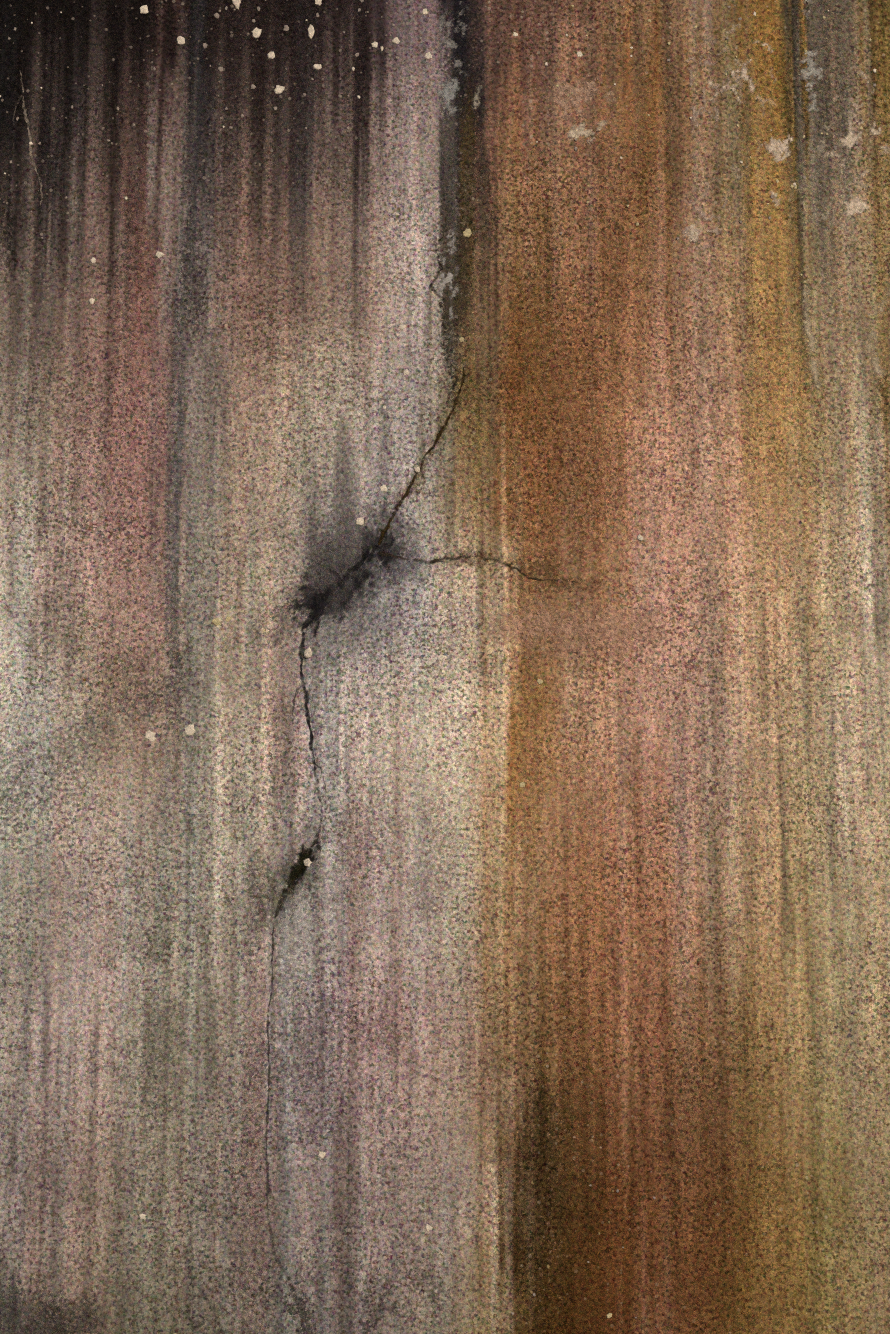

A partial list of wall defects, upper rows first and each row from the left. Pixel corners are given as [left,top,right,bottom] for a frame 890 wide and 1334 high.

damp [0,0,368,821]
damp [395,0,495,566]
rust [489,58,675,602]
crack [265,233,574,1330]
rust [507,652,545,857]
rust [486,745,795,1334]